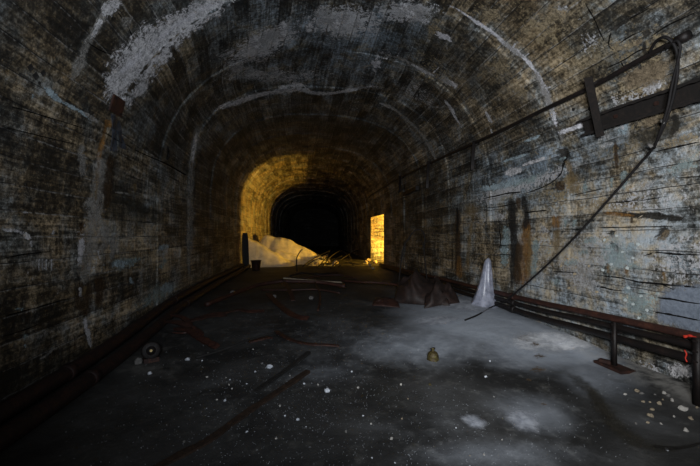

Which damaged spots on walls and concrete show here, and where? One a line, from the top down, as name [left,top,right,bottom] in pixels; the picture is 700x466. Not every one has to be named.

water stain [72,0,123,76]
water stain [102,0,235,108]
rust [508,195,532,285]